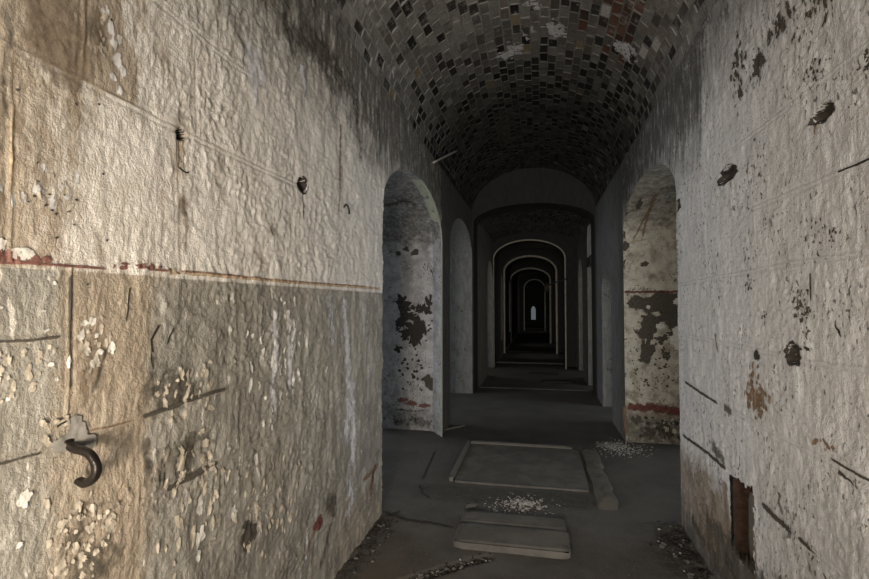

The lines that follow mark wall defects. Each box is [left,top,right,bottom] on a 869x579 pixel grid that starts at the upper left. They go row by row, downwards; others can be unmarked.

peeling [730,0,833,116]
peeling [394,293,433,408]
peeling [625,292,679,390]
rust [744,362,771,419]
leakage [692,482,764,579]